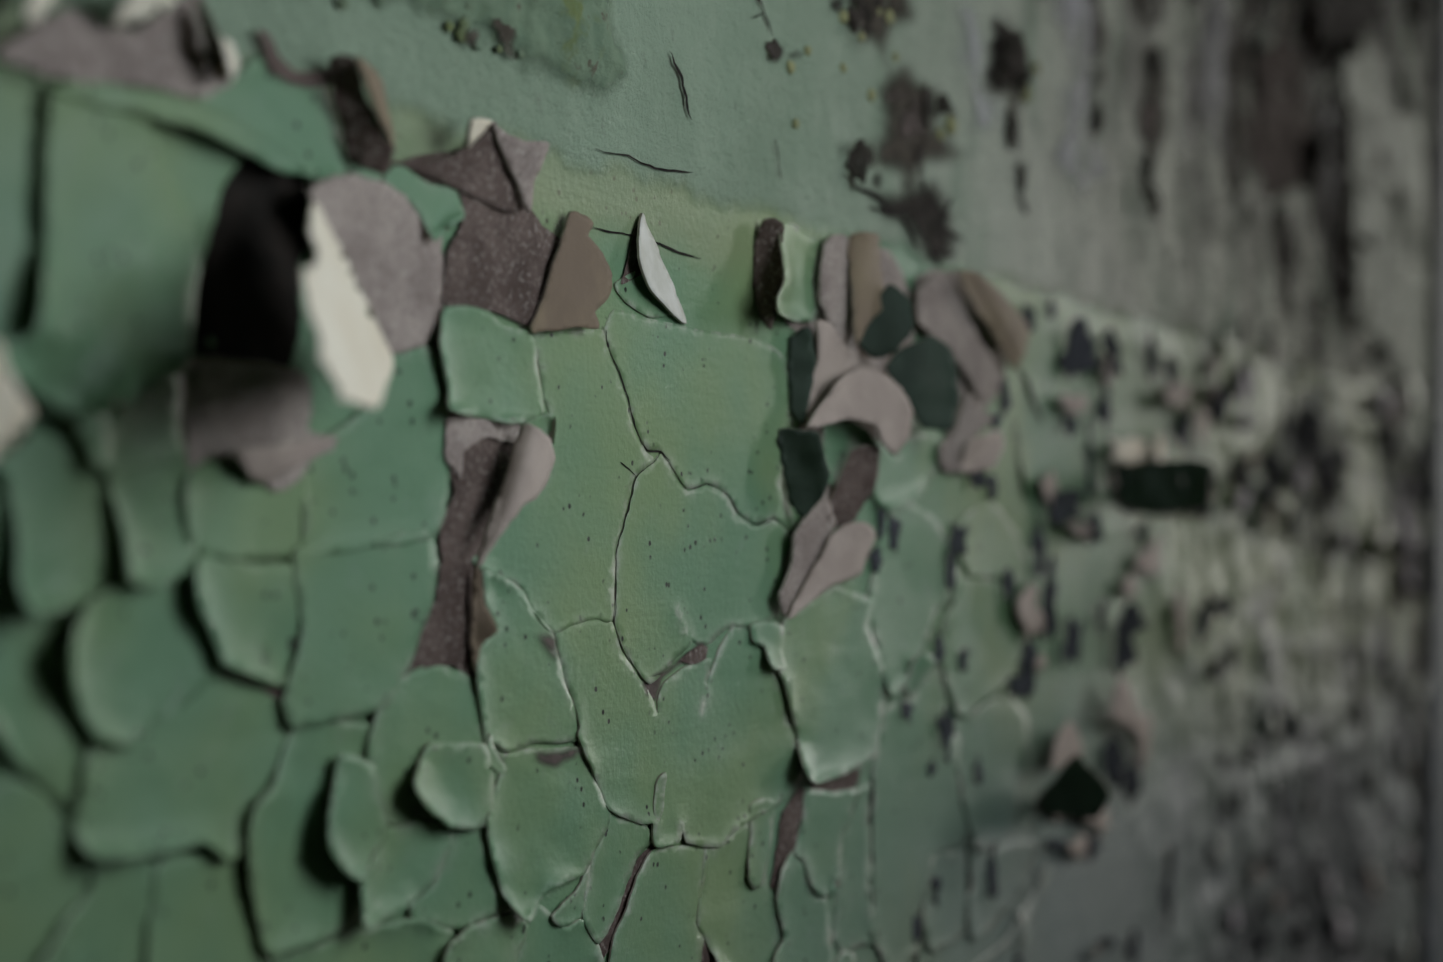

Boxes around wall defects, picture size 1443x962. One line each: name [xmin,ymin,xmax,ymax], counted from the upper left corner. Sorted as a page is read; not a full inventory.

spalling [1088,76,1105,148]
spalling [1141,94,1161,222]
spalling [1147,47,1162,75]
peeling [0,0,1058,962]
crack [606,330,779,669]
crack [1005,367,1042,501]
peeling [1035,316,1254,863]
peeling [1228,400,1355,592]
crack [868,765,922,962]